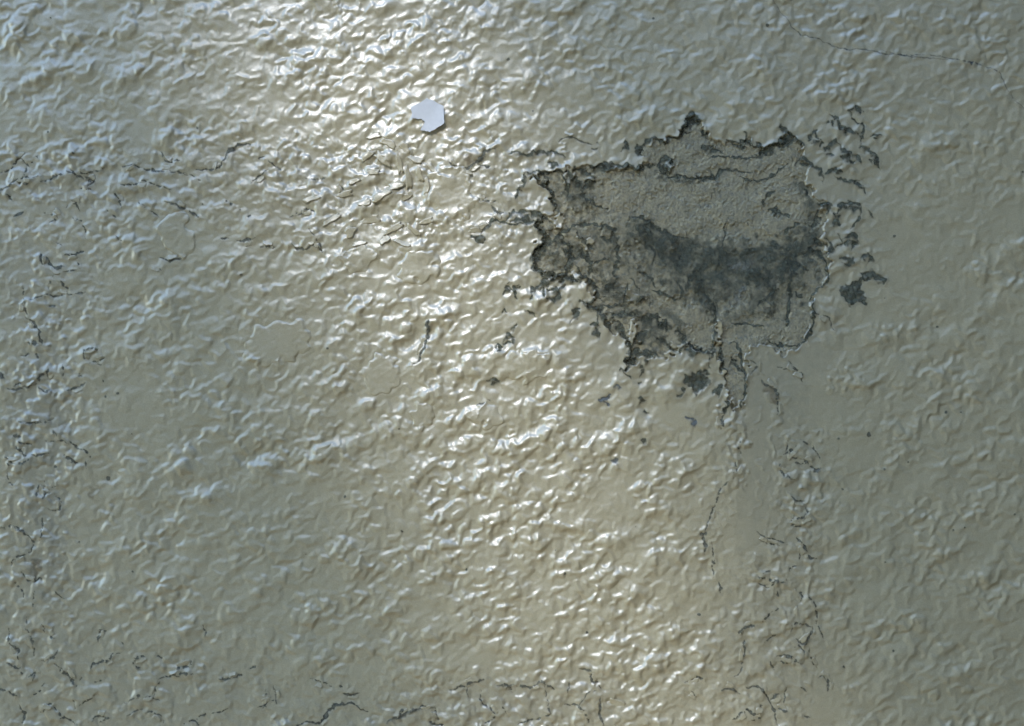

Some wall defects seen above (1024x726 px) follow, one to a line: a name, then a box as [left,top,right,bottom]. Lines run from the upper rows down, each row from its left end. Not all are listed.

crack [0,143,281,393]
crack [221,208,322,251]
peeling [468,105,887,414]
water stain [608,217,824,316]
crack [0,419,226,725]
crack [687,441,834,721]
crack [219,666,256,681]
crack [296,679,444,726]
crack [454,668,604,725]